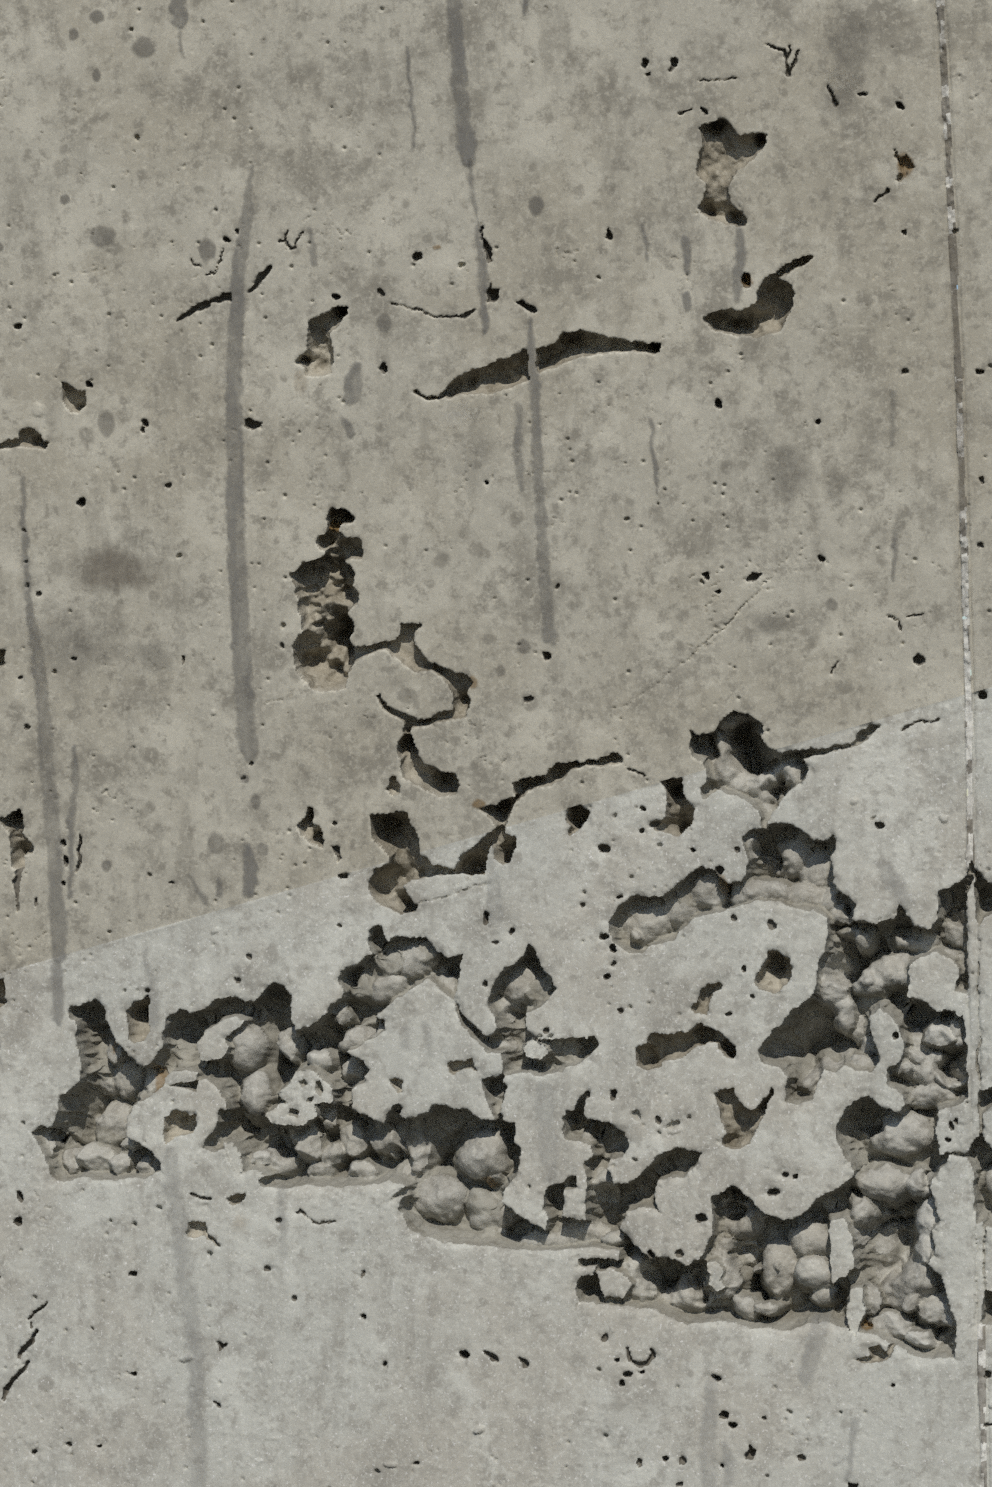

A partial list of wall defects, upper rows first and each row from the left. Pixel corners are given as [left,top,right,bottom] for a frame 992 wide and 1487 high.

leakage [449,0,466,77]
leakage [459,123,476,182]
hole [696,118,767,227]
leakage [481,259,489,332]
hole [703,255,813,338]
spalling [414,329,661,401]
leakage [226,379,243,650]
hole [289,507,364,692]
spalling [368,733,623,915]
leakage [244,844,257,896]
hole [635,982,736,1070]
hole [714,1087,774,1150]